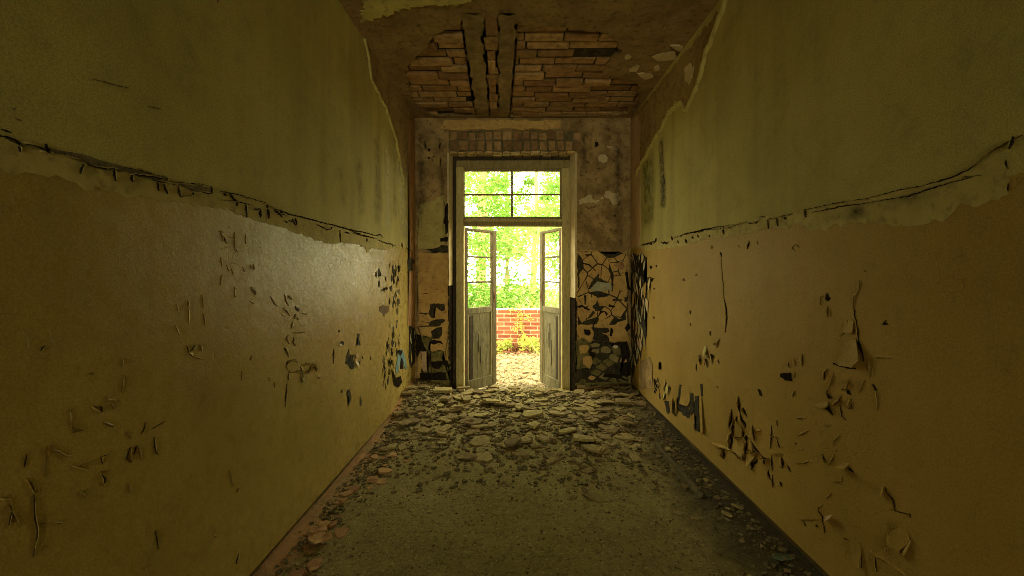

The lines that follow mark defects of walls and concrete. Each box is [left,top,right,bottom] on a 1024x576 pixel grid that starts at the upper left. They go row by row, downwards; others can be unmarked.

peeling [360,0,472,23]
spalling [631,0,727,177]
peeling [0,24,475,389]
peeling [574,159,1010,433]
peeling [732,421,756,467]